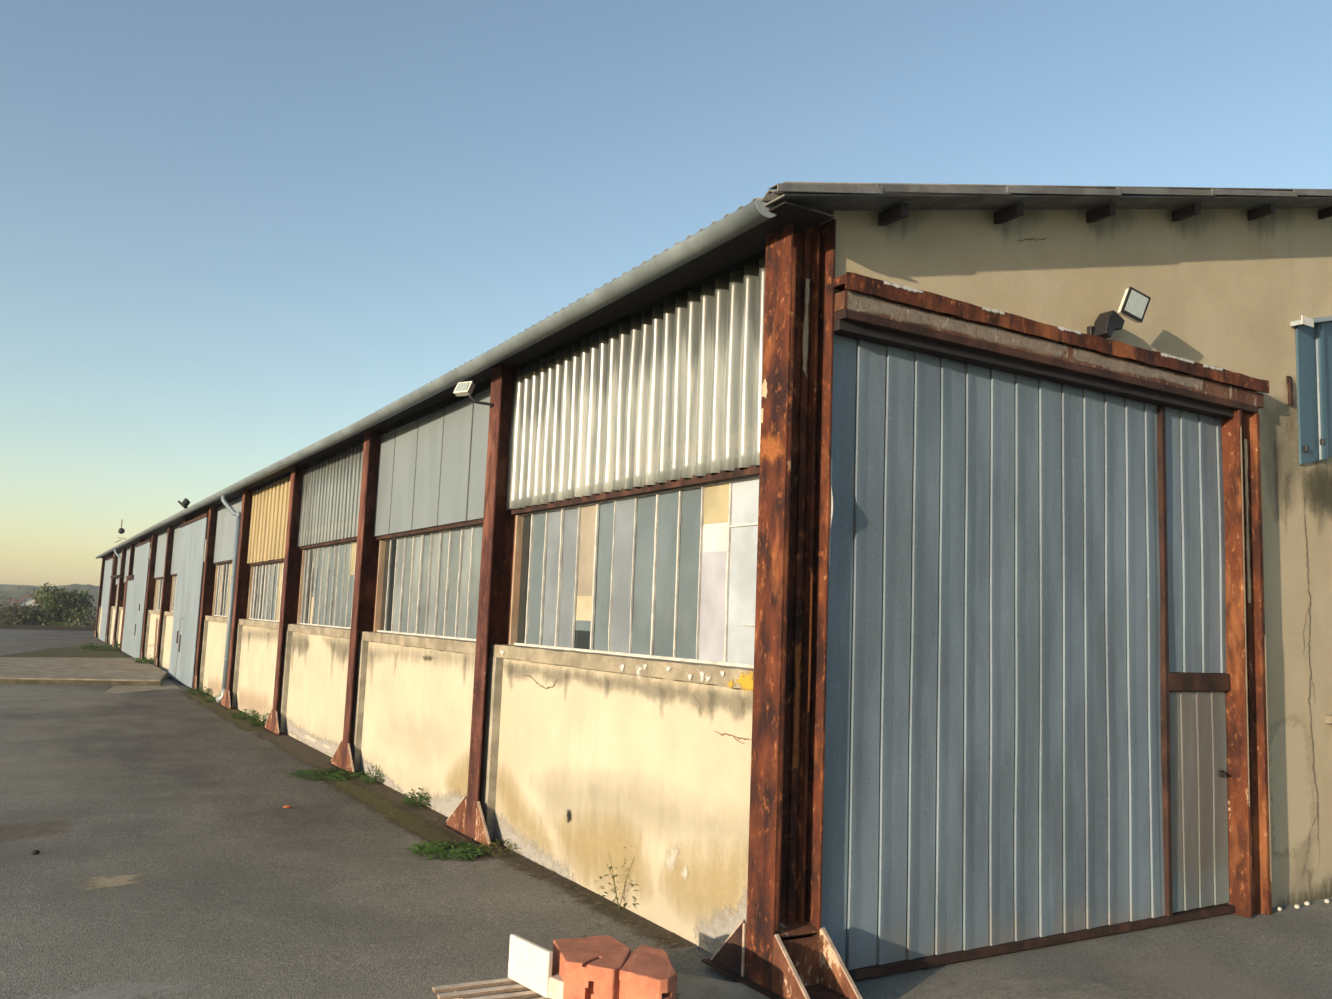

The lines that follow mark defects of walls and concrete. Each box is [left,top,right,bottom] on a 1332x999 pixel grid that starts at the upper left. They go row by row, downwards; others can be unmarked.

corrosion [760,432,783,464]
leakage [1269,412,1332,511]
corrosion [792,572,813,769]
crack [1302,491,1320,879]
leakage [453,767,468,797]